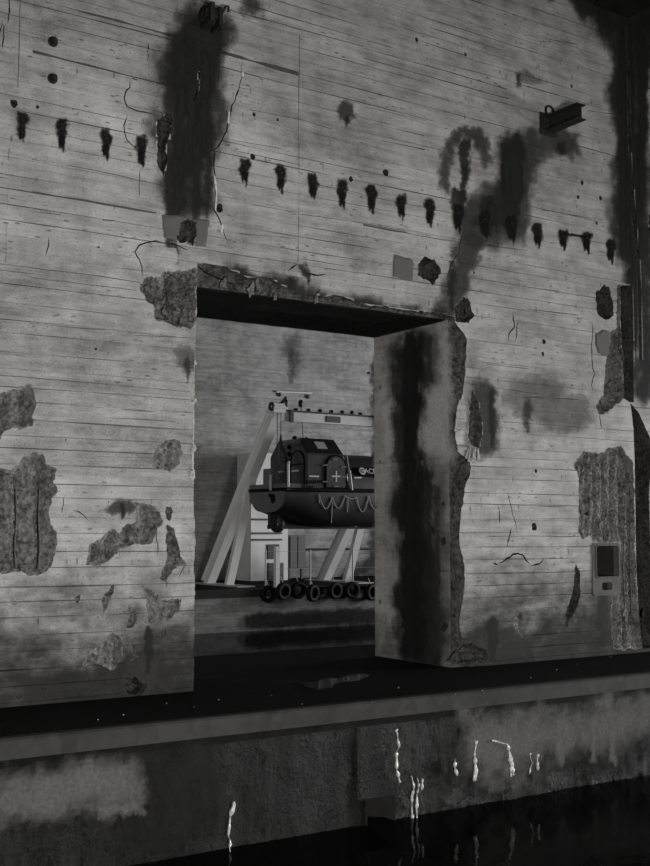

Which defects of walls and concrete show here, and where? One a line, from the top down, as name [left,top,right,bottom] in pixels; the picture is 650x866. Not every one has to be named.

leakage [148,2,235,229]
leakage [432,126,580,316]
leakage [570,0,650,404]
spalling [0,384,36,438]
spalling [0,452,58,576]
spalling [86,502,186,582]
spalling [139,263,489,668]
leakage [370,326,450,666]
crack [494,493,544,566]
spalling [573,446,645,651]
spalling [595,284,624,415]
leakage [467,692,650,782]